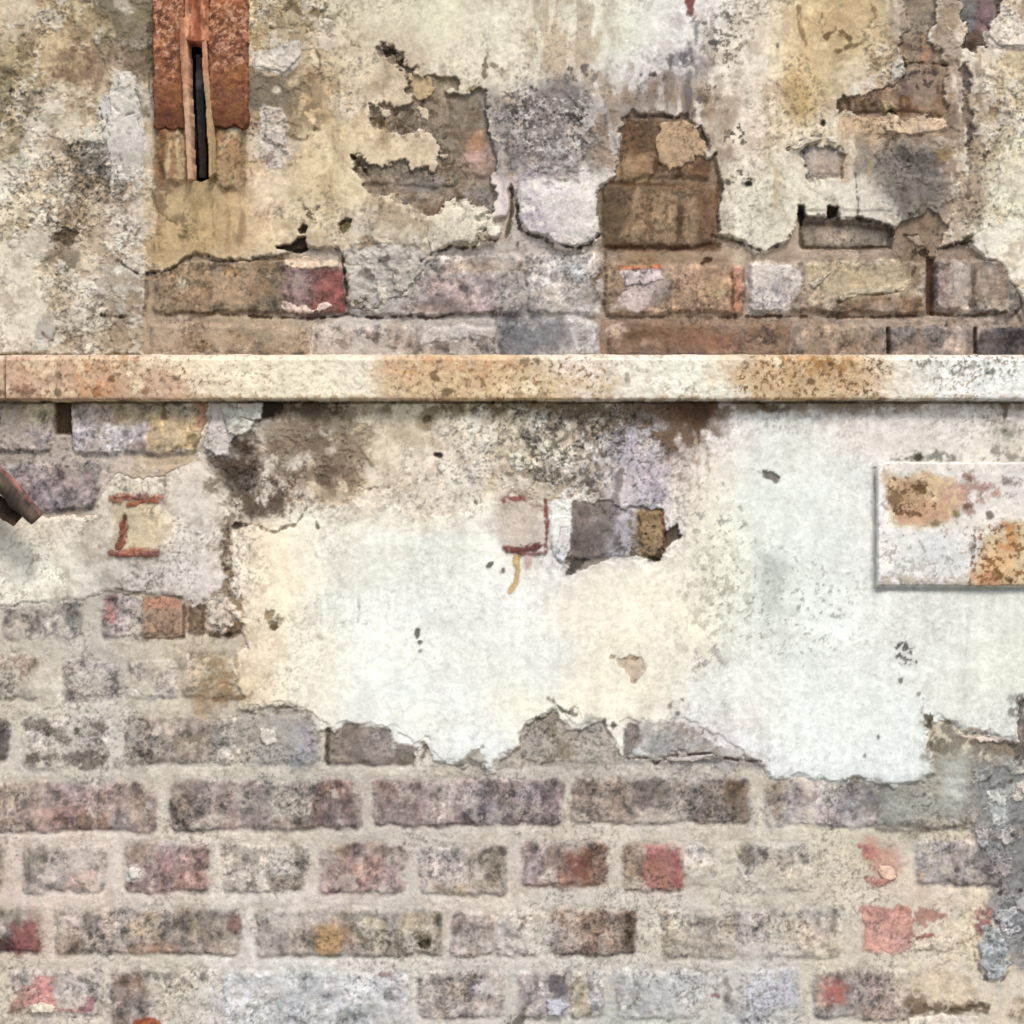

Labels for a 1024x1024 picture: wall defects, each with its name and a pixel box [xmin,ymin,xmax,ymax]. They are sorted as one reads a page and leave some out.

spalling [786,0,951,180]
spalling [144,40,501,354]
spalling [596,109,740,254]
spalling [564,205,949,354]
peeling [204,402,263,456]
damp [204,401,373,576]
spalling [550,499,682,575]
damp [425,401,927,514]
spalling [141,596,245,640]
peeling [194,655,762,778]
peeling [858,694,1024,1024]
peeling [504,973,581,1024]